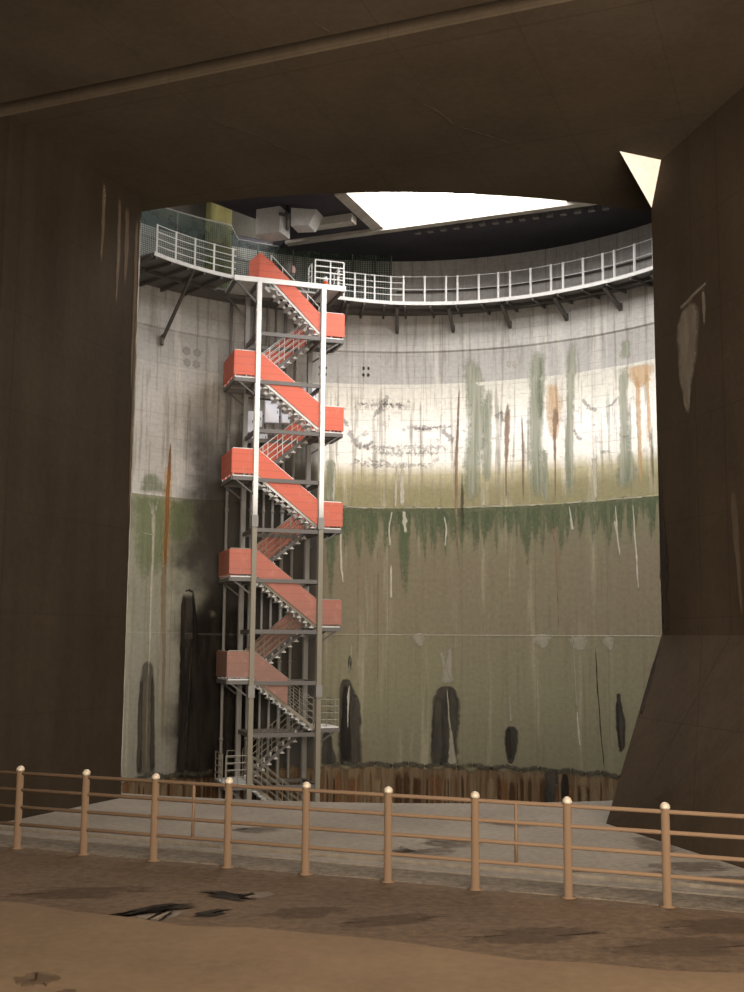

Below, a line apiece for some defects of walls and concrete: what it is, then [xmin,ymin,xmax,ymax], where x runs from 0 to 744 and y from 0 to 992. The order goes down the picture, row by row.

corrosion [161,444,171,728]
water stain [137,502,259,779]
water stain [332,464,447,546]
water stain [322,634,621,802]
water stain [454,634,653,752]
water stain [563,459,645,554]